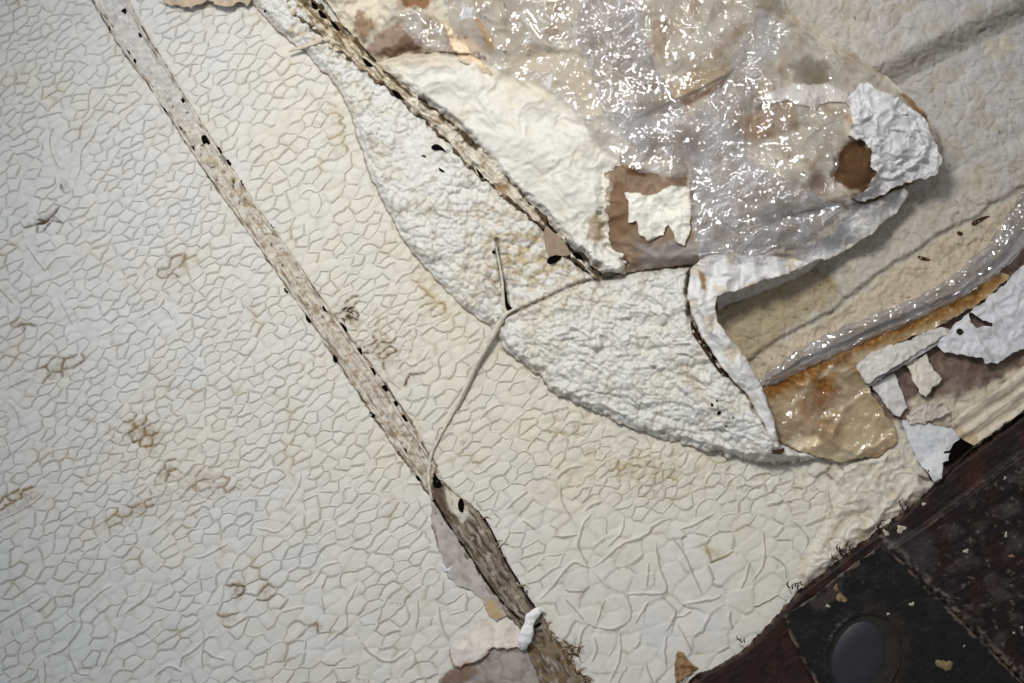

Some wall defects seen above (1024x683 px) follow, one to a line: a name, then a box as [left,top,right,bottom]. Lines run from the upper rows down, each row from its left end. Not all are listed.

crack [0,0,485,683]
crack [129,0,834,683]
peeling [430,500,539,683]
peeling [856,247,1024,482]